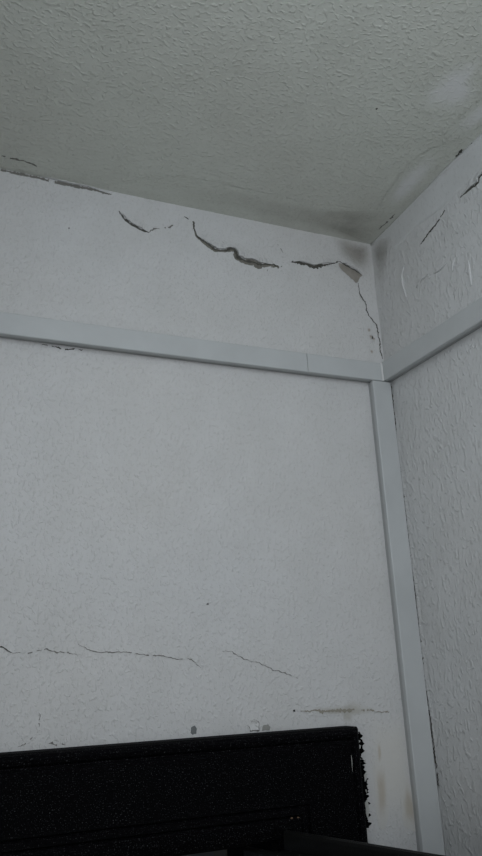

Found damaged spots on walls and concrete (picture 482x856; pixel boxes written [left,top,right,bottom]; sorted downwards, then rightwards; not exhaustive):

crack [421,167,482,244]
crack [114,207,338,276]
crack [0,645,201,668]